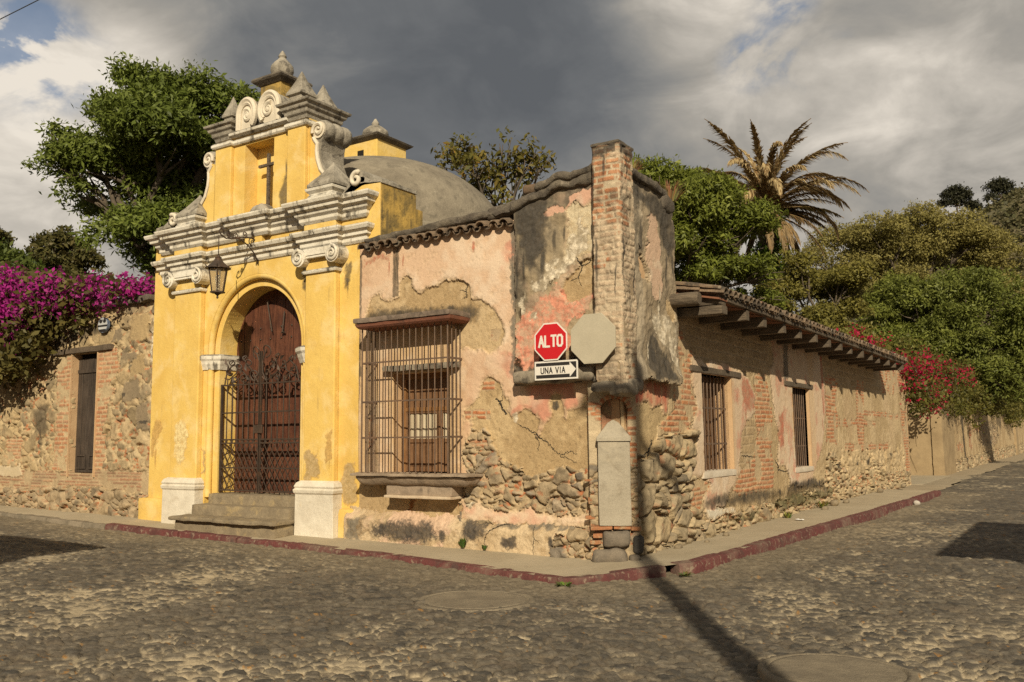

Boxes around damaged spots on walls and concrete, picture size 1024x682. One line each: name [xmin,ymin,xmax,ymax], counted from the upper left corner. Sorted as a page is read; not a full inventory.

peeling [514,217,594,371]
crack [495,396,574,461]
flaking render [731,373,774,498]
flaking render [825,374,910,471]
flaking render [879,370,905,394]
damp [372,521,445,545]